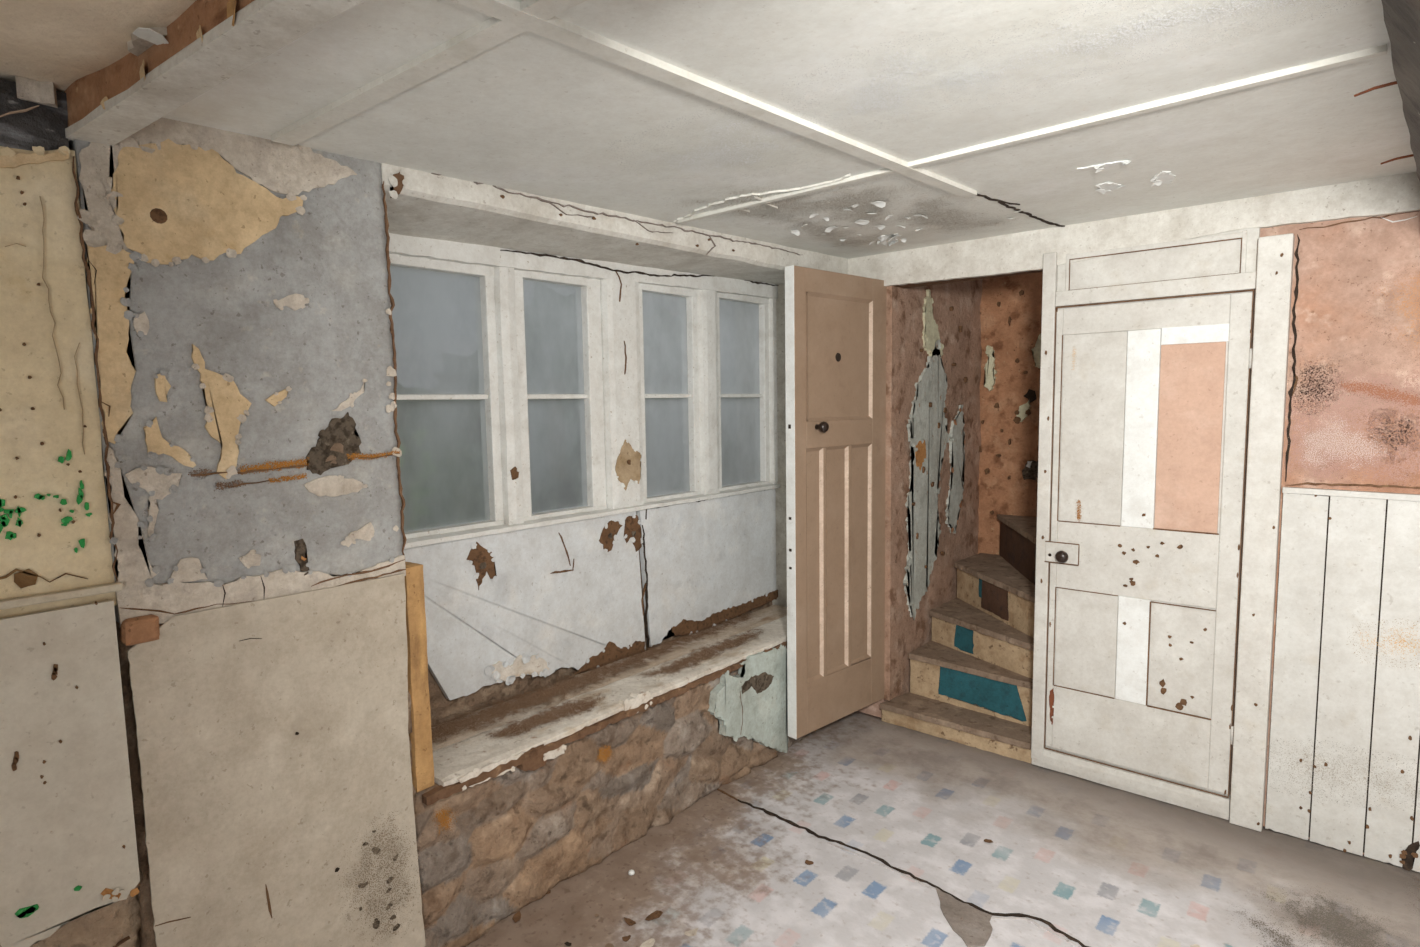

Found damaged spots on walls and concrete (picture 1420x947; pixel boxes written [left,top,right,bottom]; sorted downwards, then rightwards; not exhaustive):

flaking render [0,75,58,117]
crack [976,193,1065,227]
peeling [0,118,407,627]
peeling [903,289,1049,620]
peeling [599,513,643,558]
peeling [466,542,497,590]
flaking render [708,644,789,753]
crack [717,788,1089,947]
peeling [15,904,39,918]
peeling [100,887,139,903]